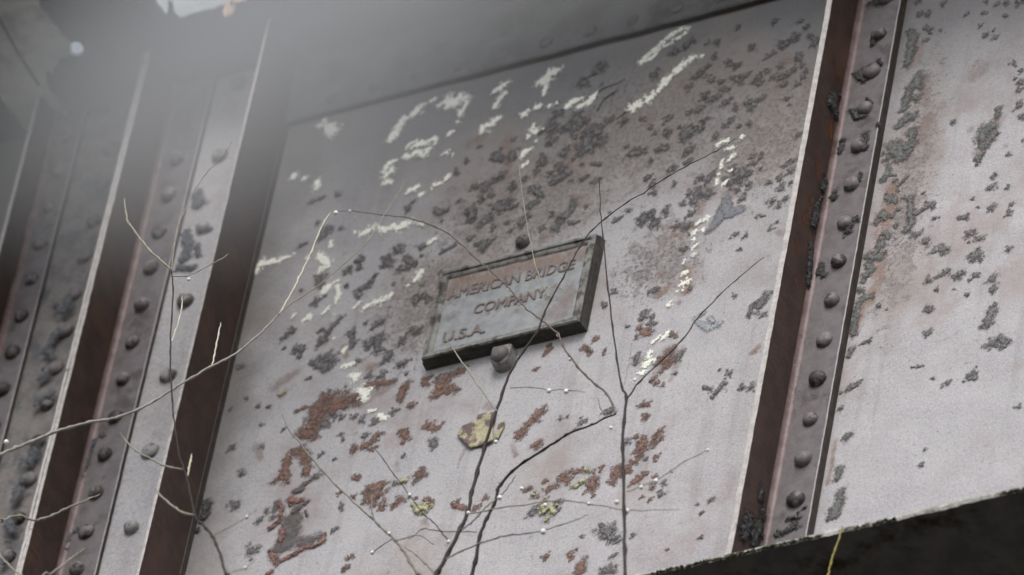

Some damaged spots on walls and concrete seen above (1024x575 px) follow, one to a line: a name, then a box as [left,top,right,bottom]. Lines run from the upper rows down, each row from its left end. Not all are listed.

peeling [516,64,598,169]
peeling [637,26,690,66]
peeling [624,54,705,113]
peeling [665,134,746,308]
peeling [846,0,947,358]
peeling [255,240,342,325]
peeling [332,337,391,421]
rust [634,323,655,341]
rust [648,331,679,387]
rust [267,365,470,486]
rust [513,405,548,451]
rust [522,399,666,503]